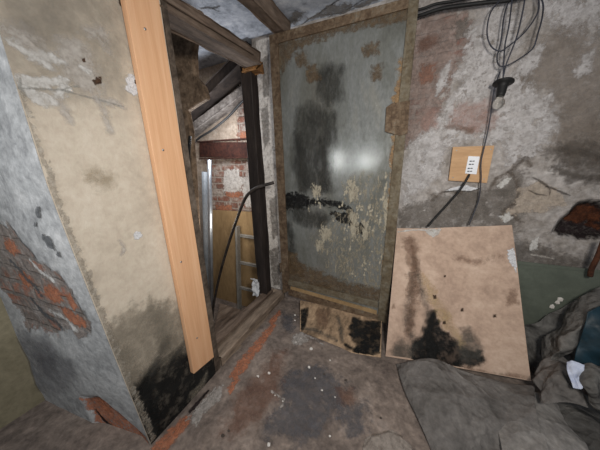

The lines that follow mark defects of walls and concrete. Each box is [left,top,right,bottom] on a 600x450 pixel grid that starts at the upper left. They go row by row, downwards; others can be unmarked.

spalling [0,221,91,339]
spalling [20,94,156,443]
leakage [109,300,224,444]
leakage [292,308,323,345]
peeling [315,172,391,288]
leakage [336,317,381,355]
leakage [393,310,485,367]
spalling [499,182,600,240]